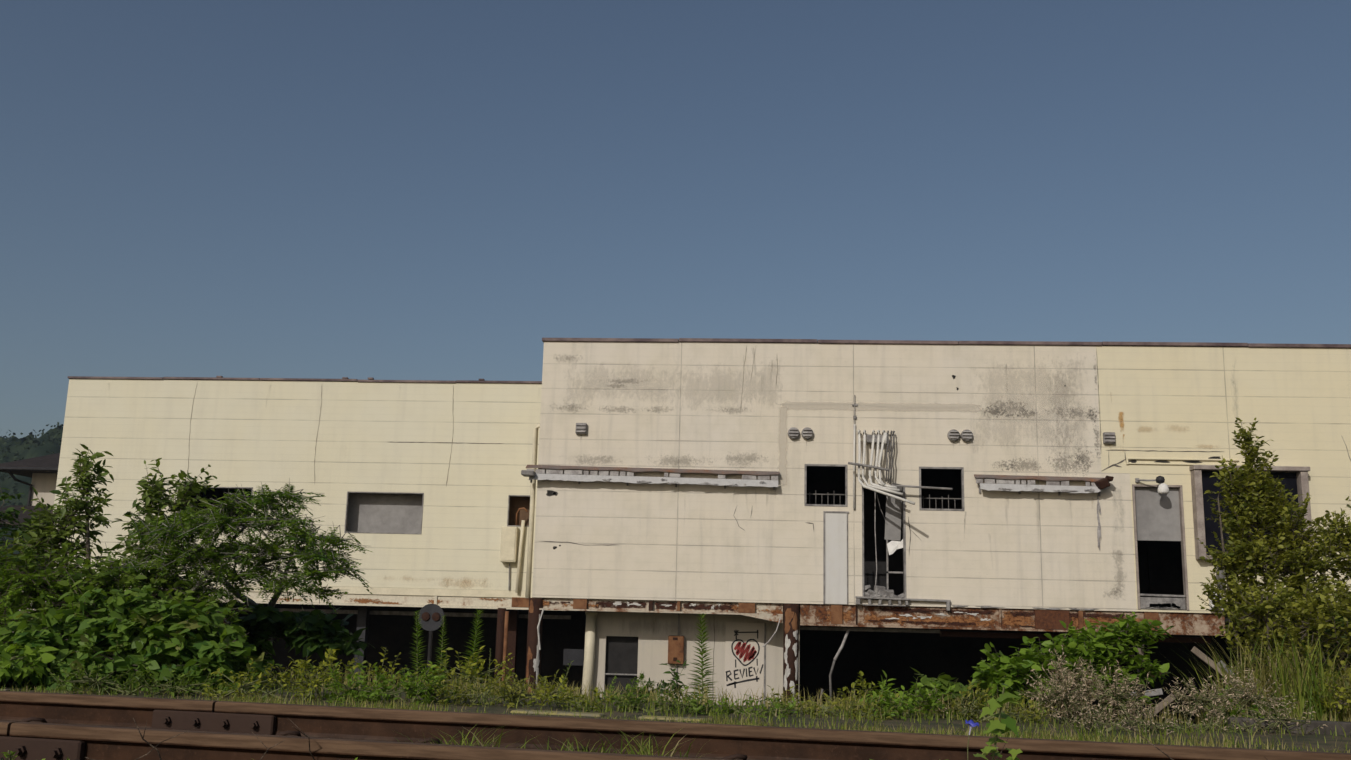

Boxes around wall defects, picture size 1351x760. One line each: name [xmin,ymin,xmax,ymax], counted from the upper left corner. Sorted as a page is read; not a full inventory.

crack [314,387,322,481]
corrosion [529,600,738,613]
corrosion [755,608,797,634]
corrosion [826,607,1035,627]
corrosion [1069,612,1140,627]